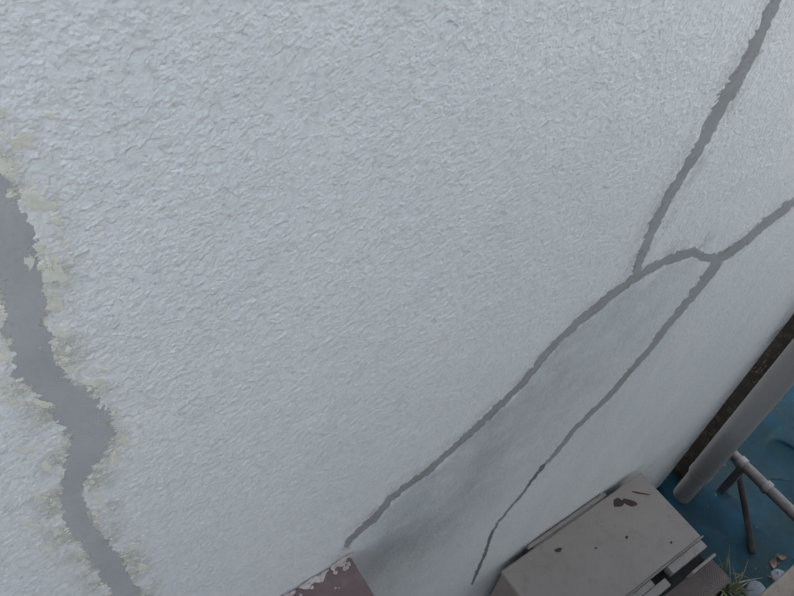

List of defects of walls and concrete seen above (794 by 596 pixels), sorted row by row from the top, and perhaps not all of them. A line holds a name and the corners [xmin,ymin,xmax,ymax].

crack [0,108,151,596]
crack [344,0,794,585]